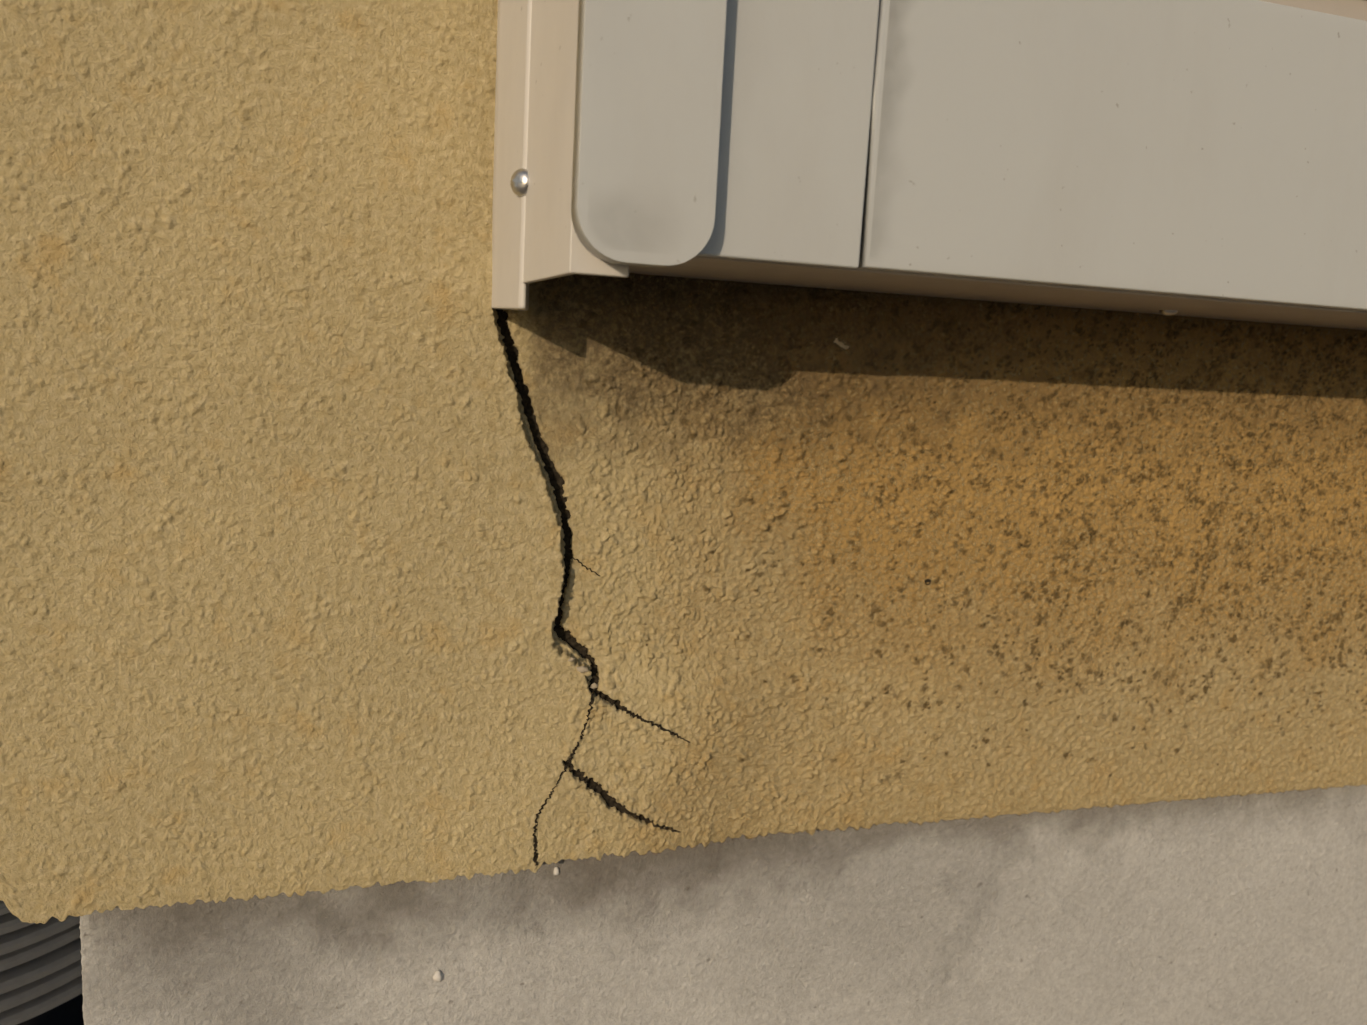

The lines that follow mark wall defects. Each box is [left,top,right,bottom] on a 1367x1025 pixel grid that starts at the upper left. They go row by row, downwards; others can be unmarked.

crack [496,309,690,866]
leakage [636,282,1367,700]